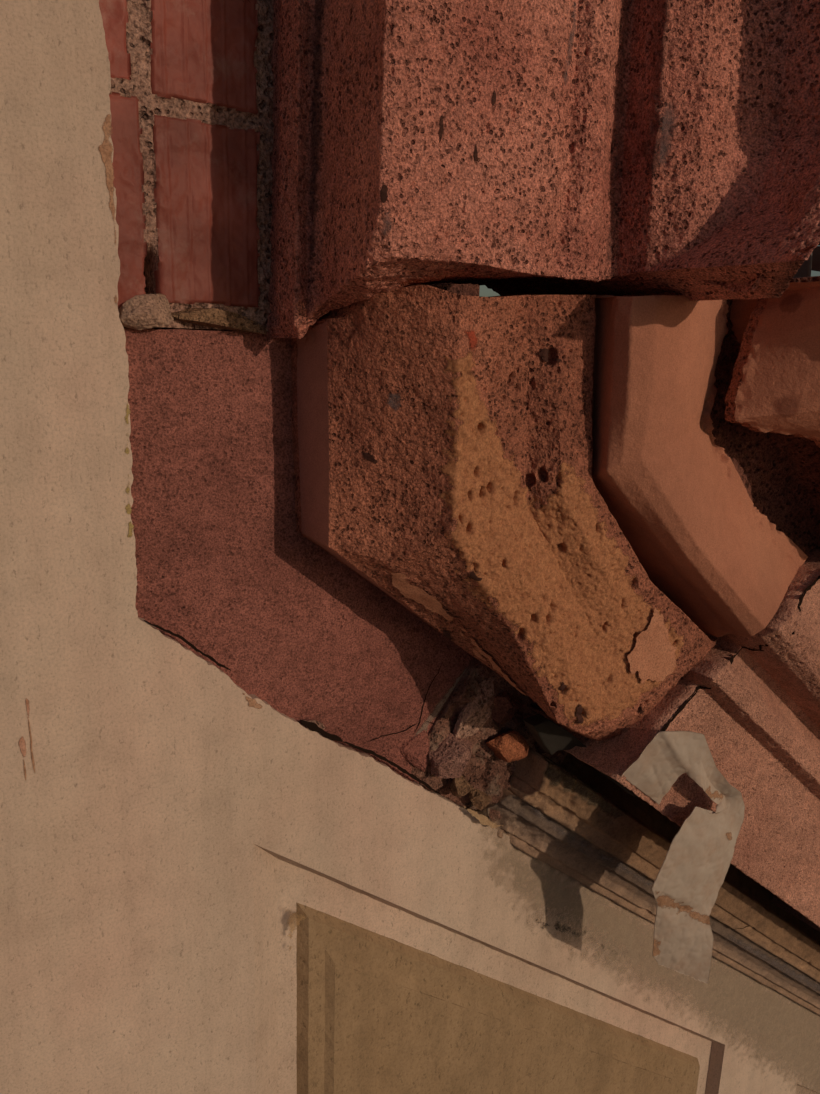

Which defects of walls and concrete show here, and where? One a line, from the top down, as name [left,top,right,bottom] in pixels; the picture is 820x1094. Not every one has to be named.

spalling [725,298,778,434]
spalling [385,569,568,828]
spalling [439,352,684,726]
crack [662,686,712,731]
crack [730,644,768,664]
crack [792,576,820,635]